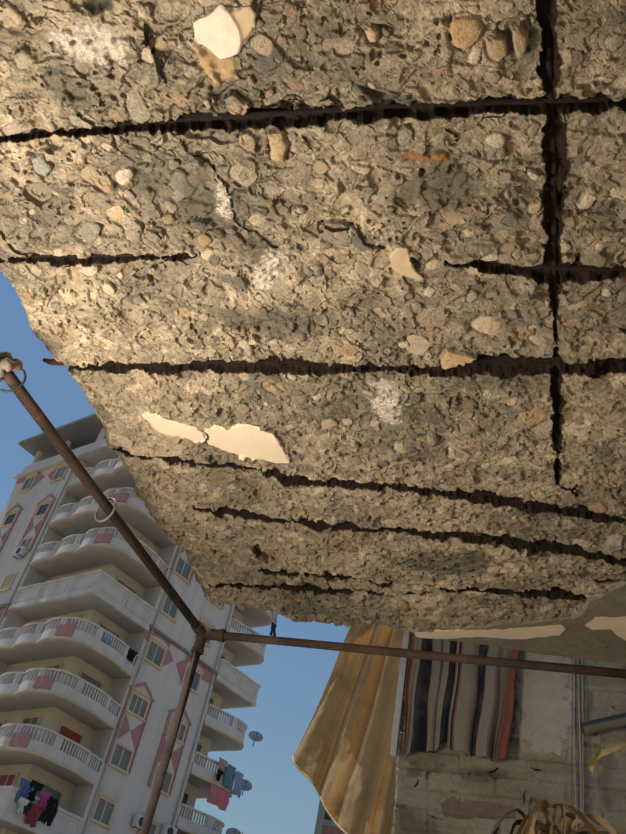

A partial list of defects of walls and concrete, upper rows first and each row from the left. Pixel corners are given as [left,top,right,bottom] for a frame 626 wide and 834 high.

spalling [193,5,256,84]
crack [0,0,626,524]
spalling [389,248,424,281]
water stain [369,379,407,424]
spalling [441,796,516,819]